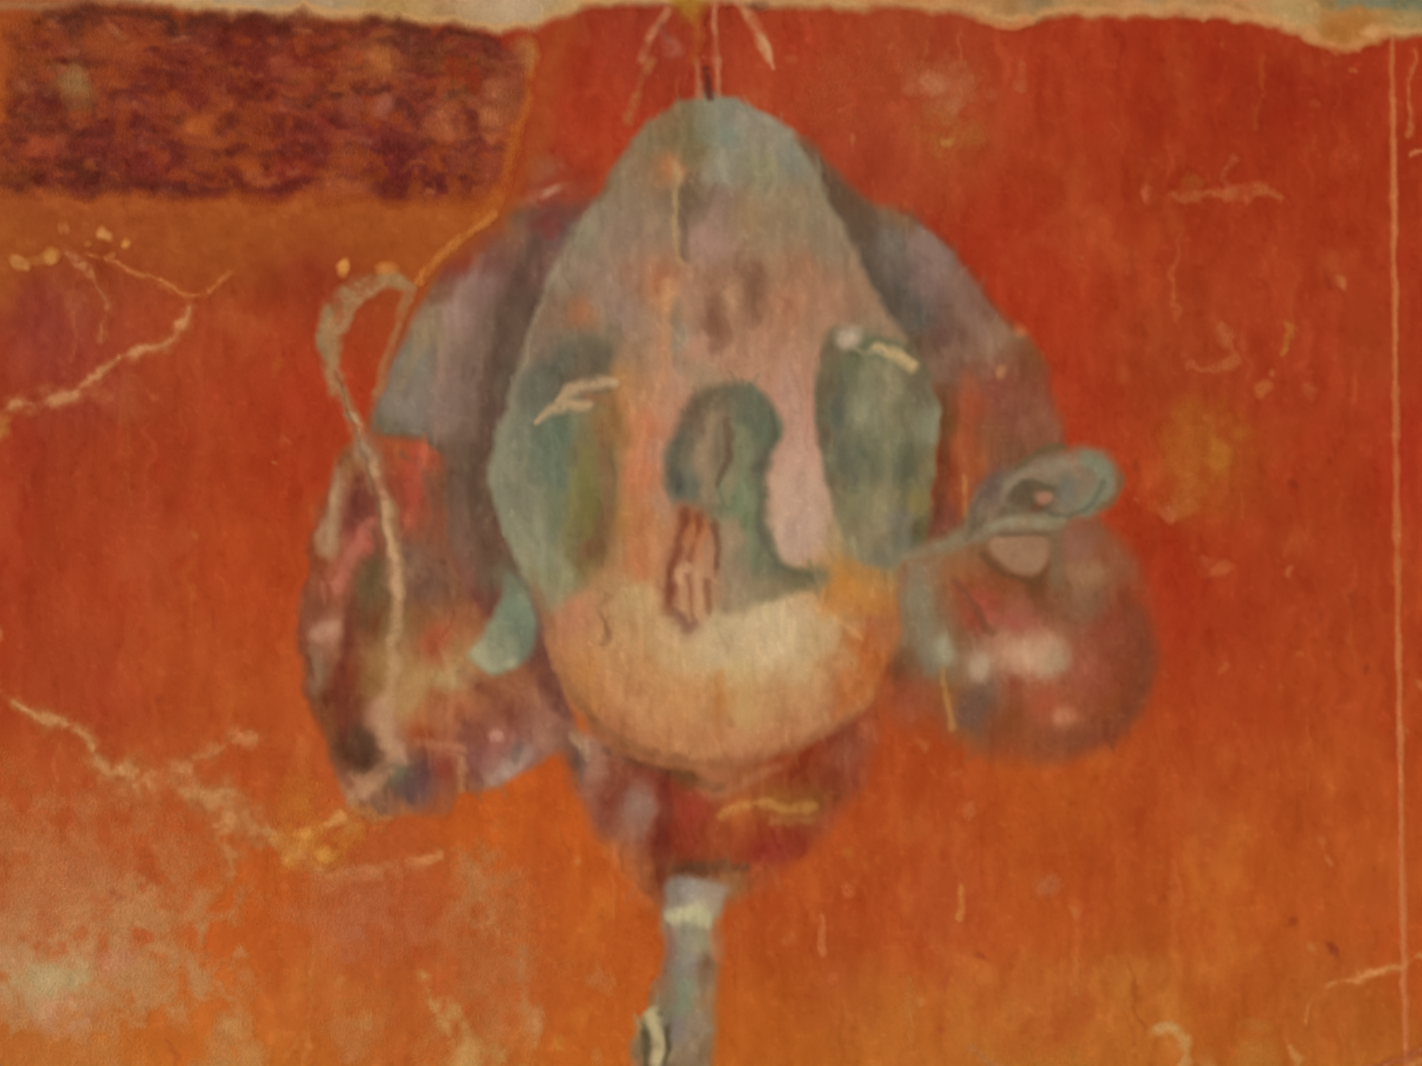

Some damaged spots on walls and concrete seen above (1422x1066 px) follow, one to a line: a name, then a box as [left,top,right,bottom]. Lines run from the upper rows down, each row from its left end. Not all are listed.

flaking render [706,0,1329,50]
flaking render [1353,9,1422,48]
peeling [0,0,667,274]
crack [1401,43,1422,161]
flaking render [334,255,351,281]
crack [0,242,239,449]
crack [0,616,460,898]
crack [1300,948,1422,1029]